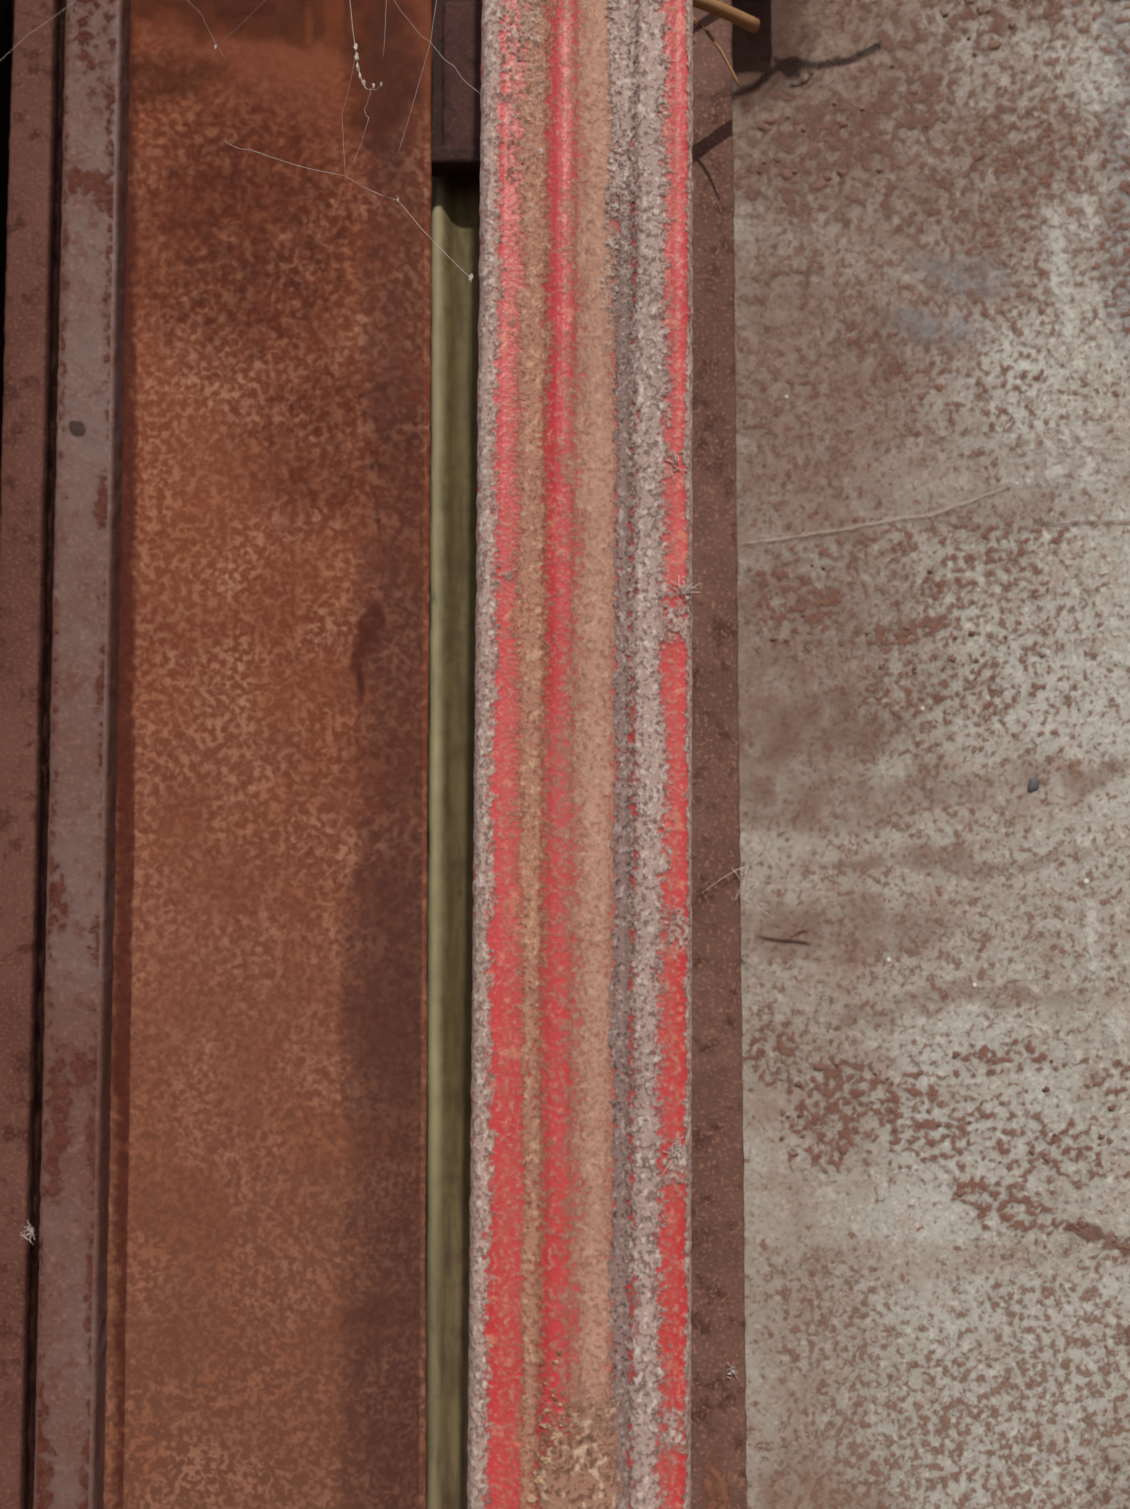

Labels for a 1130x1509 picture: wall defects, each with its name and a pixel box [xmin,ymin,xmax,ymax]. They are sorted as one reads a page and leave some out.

corrosion [131,0,417,149]
corrosion [63,0,116,382]
corrosion [164,128,342,324]
corrosion [93,476,108,529]
corrosion [94,645,105,766]
peeling [467,0,547,1509]
peeling [600,0,693,1509]
corrosion [732,0,1130,1509]
corrosion [47,857,72,957]
corrosion [42,1031,97,1364]
corrosion [35,1353,56,1509]
corrosion [78,1399,90,1509]